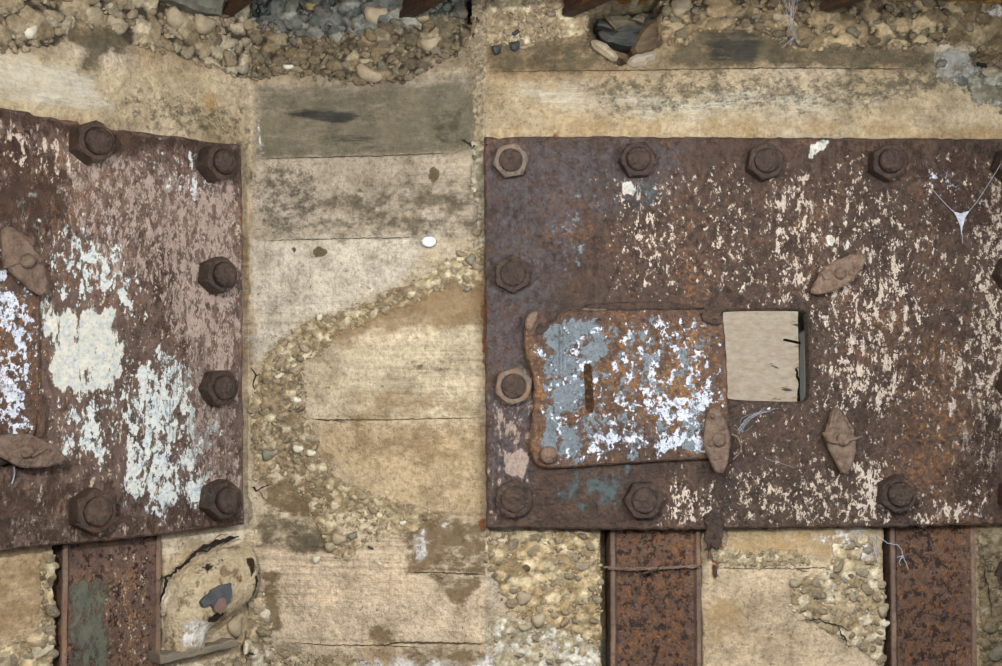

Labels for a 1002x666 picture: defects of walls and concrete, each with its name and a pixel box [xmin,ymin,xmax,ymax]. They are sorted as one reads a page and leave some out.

corrosion [0,110,83,247]
corrosion [112,131,219,168]
corrosion [140,235,193,364]
spalling [0,0,591,560]
peeling [614,172,688,292]
peeling [694,161,919,414]
peeling [491,316,712,510]
corrosion [574,327,708,430]
peeling [0,497,152,666]
corrosion [0,462,243,666]
leakage [361,647,496,666]
corrosion [889,525,968,666]